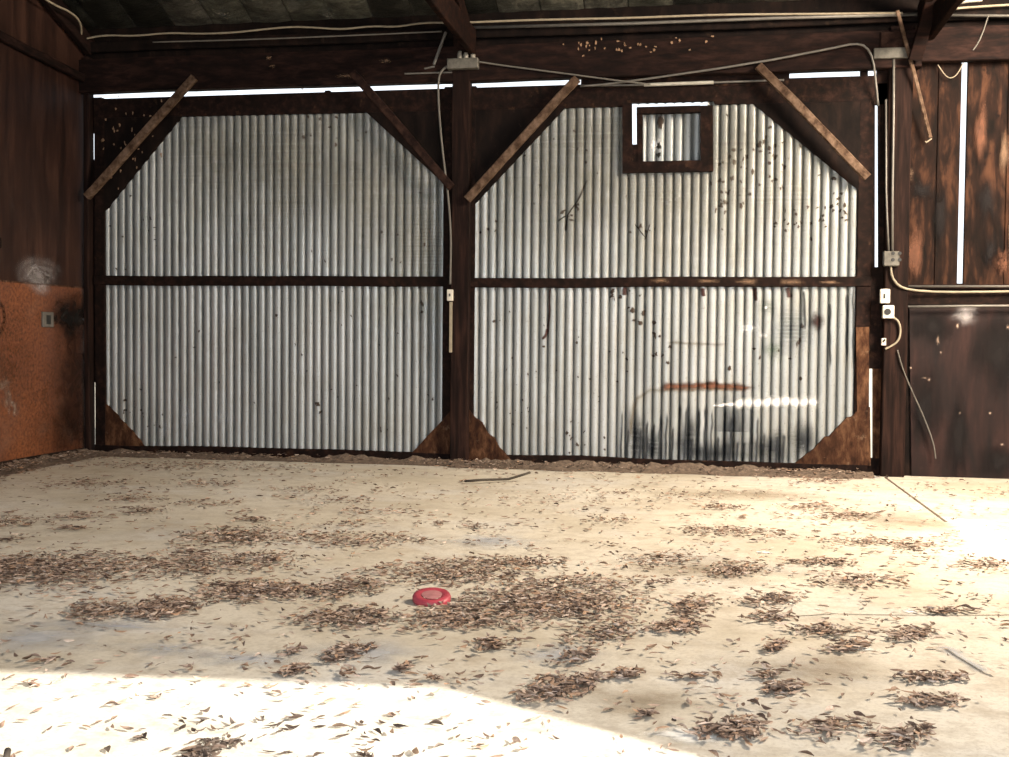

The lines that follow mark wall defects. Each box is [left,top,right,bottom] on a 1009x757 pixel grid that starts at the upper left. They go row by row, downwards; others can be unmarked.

corrosion [663,382,748,390]
water stain [620,397,818,463]